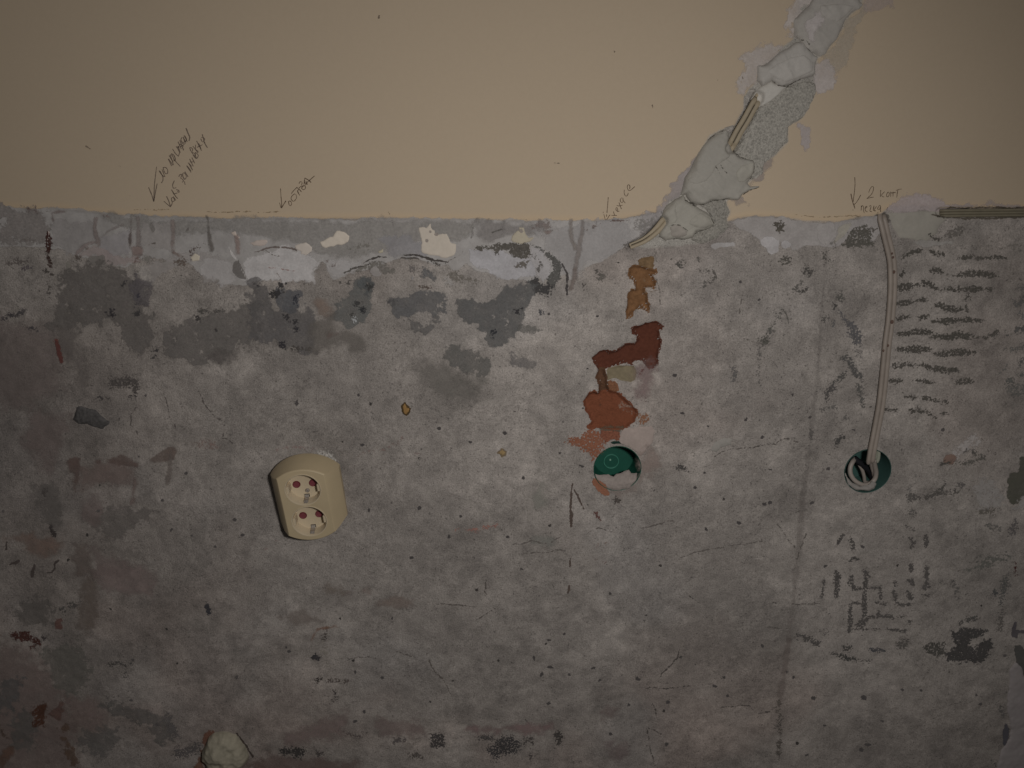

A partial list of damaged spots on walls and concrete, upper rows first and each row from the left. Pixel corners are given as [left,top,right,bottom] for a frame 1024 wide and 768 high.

peeling [731,215,880,255]
leakage [44,217,374,366]
peeling [0,202,664,472]
leakage [387,281,545,377]
spalling [592,478,622,504]